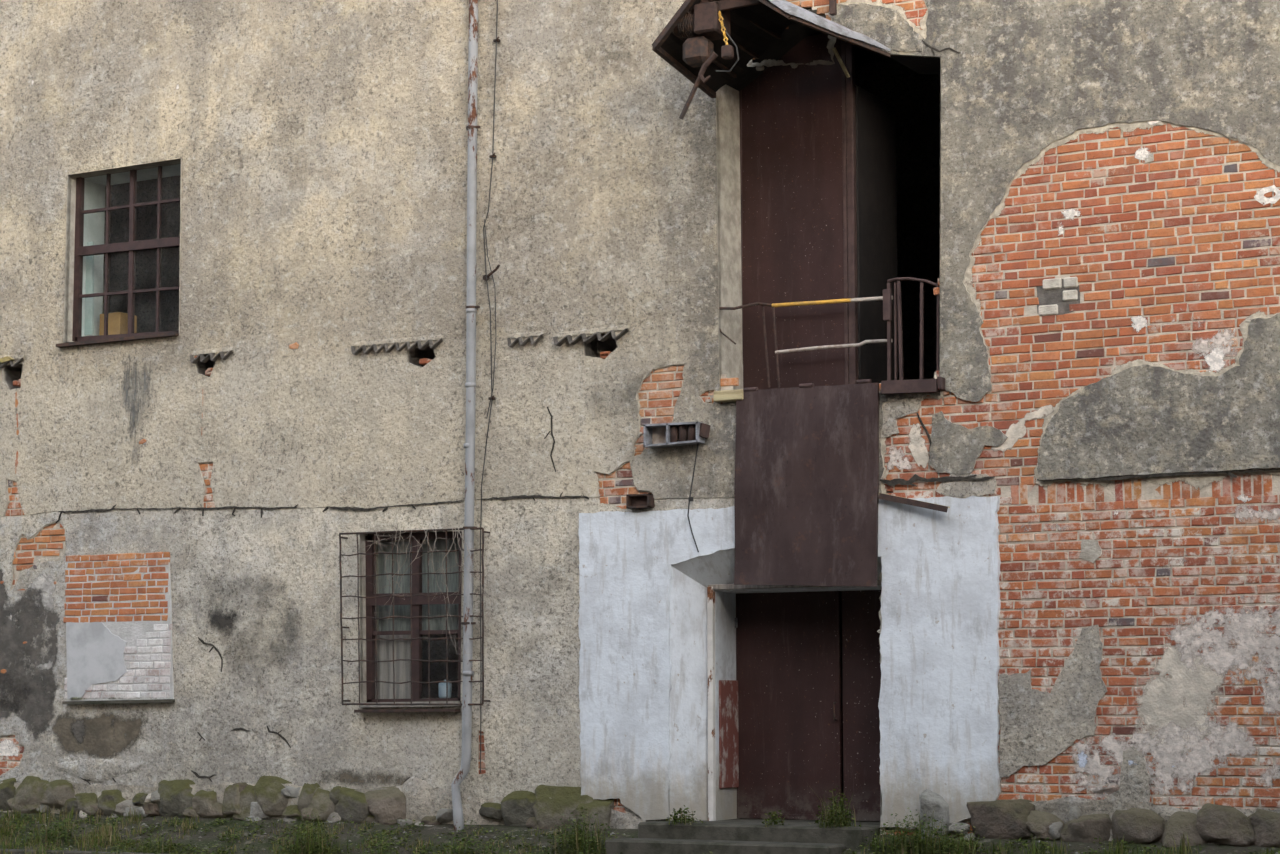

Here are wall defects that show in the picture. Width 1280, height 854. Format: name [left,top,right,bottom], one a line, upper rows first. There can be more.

flaking render [747,0,928,71]
flaking render [0,451,26,517]
spalling [4,364,23,435]
flaking render [198,462,215,508]
crack [55,406,589,523]
flaking render [588,364,686,510]
flaking render [879,119,1280,810]
flaking render [0,511,66,590]
water stain [0,569,144,759]
flaking render [0,734,24,776]